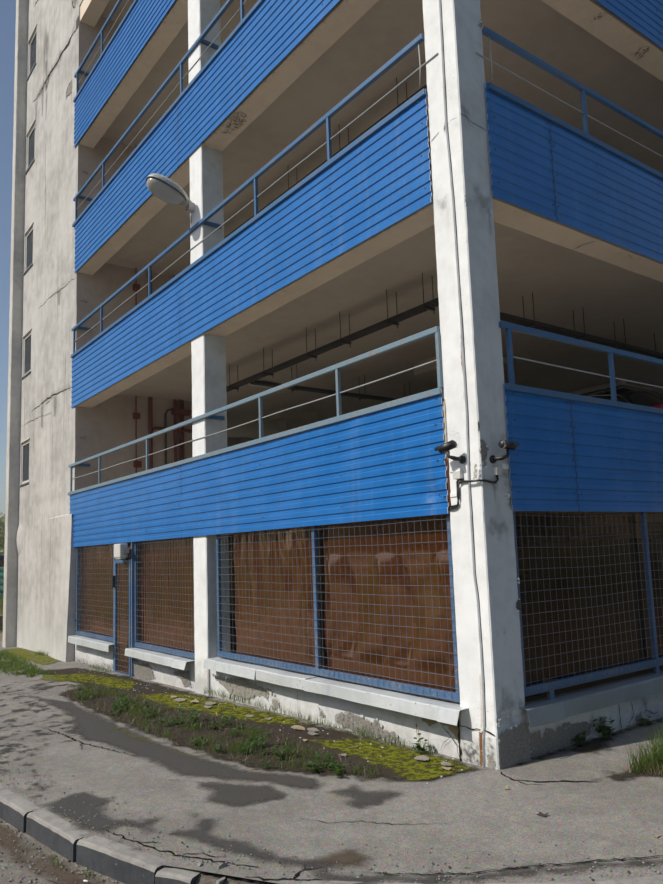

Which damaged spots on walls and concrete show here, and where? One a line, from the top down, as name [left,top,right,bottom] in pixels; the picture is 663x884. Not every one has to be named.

crack [33,30,76,102]
crack [23,387,71,426]
peeling [133,658,154,680]
peeling [173,670,191,687]
peeling [211,673,279,709]
peeling [335,711,399,742]
peeling [421,717,461,742]
crack [439,716,495,761]
peeling [486,713,607,770]
crack [103,829,322,880]
crack [377,855,660,875]